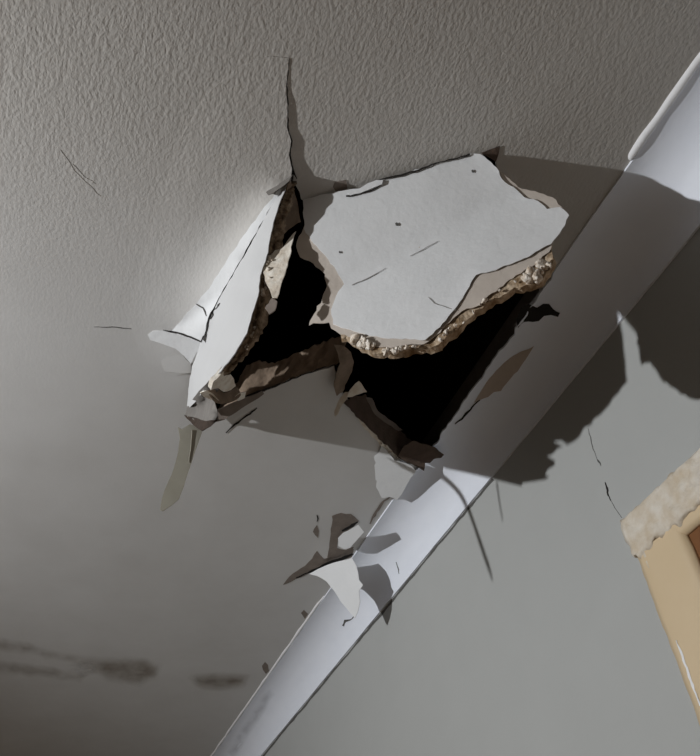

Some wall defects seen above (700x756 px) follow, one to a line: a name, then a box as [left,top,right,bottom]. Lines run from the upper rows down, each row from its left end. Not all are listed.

crack [286,59,297,181]
peeling [333,180,383,195]
spalling [516,304,560,327]
peeling [148,330,206,374]
peeling [474,346,534,403]
spalling [217,336,444,500]
peeling [283,513,364,626]
spalling [676,640,700,706]